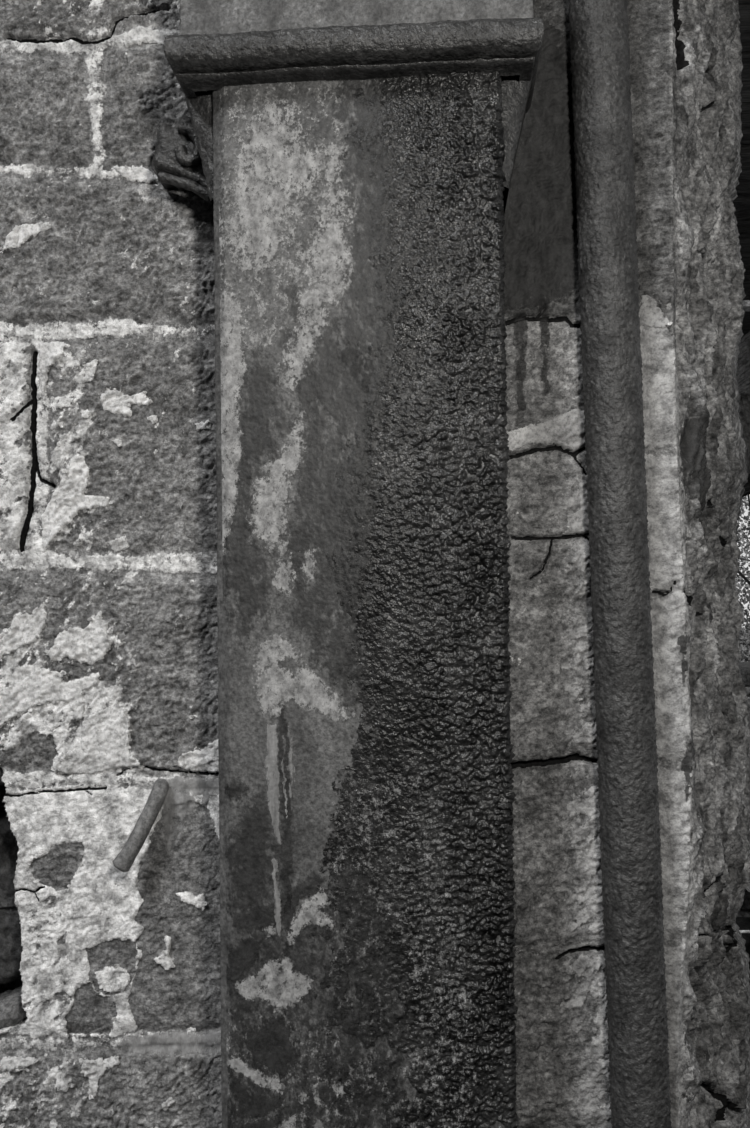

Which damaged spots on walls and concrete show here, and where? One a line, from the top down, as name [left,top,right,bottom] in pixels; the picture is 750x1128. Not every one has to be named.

crack [7,9,169,45]
crack [10,351,56,552]
water stain [222,341,326,644]
crack [5,765,219,797]
water stain [225,702,324,983]
crack [555,946,605,960]
water stain [245,1016,298,1076]
water stain [227,1080,284,1128]